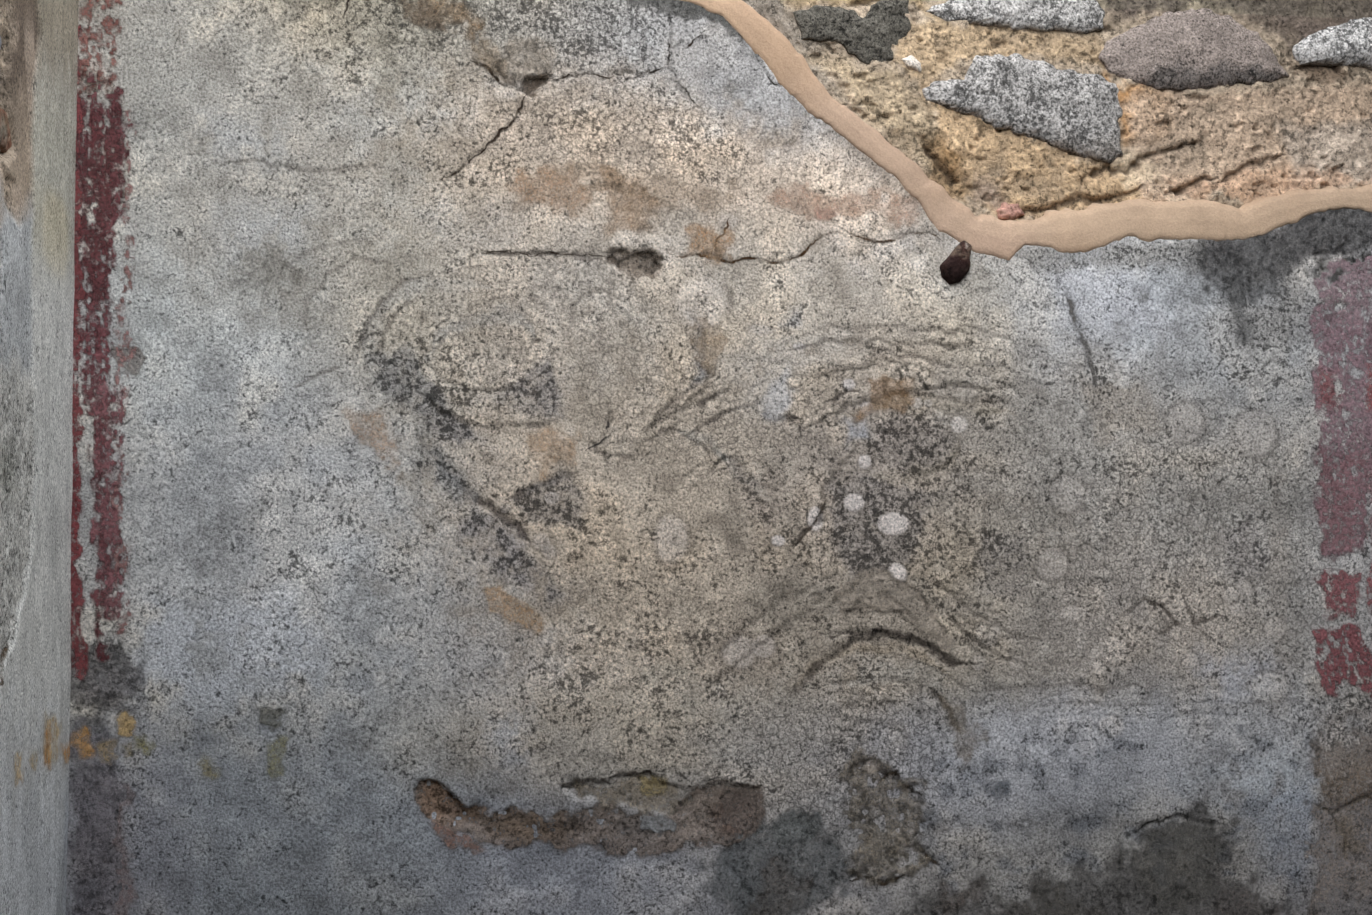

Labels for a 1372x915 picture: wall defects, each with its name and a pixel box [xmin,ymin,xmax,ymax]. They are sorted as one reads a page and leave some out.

crack [440,13,702,180]
crack [484,250,610,258]
crack [667,218,941,264]
spalling [414,776,766,858]
leakage [701,811,849,915]
spalling [840,749,932,885]
leakage [901,801,1293,915]